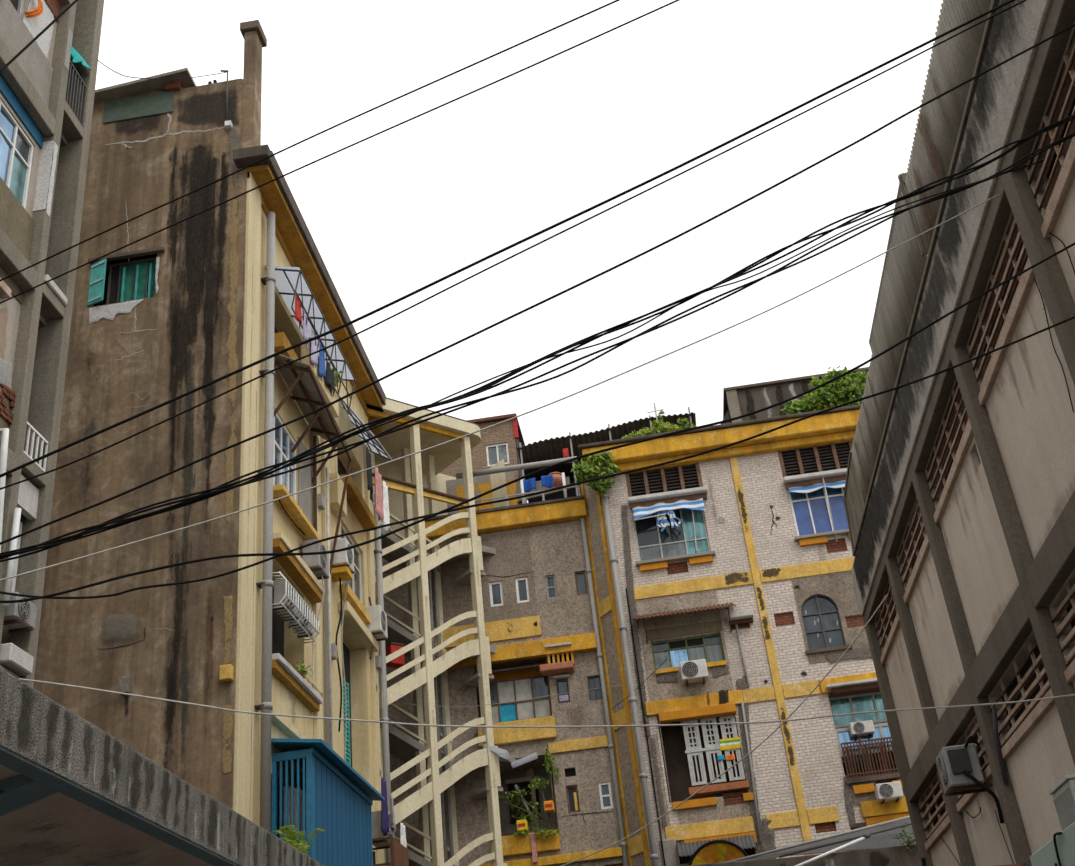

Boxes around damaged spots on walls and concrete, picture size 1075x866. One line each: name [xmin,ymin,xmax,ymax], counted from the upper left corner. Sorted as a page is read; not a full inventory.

crack [106,113,225,149]
spalling [0,308,16,424]
spalling [89,299,143,324]
water stain [853,0,1023,602]
water stain [47,144,316,866]
water stain [7,685,34,750]